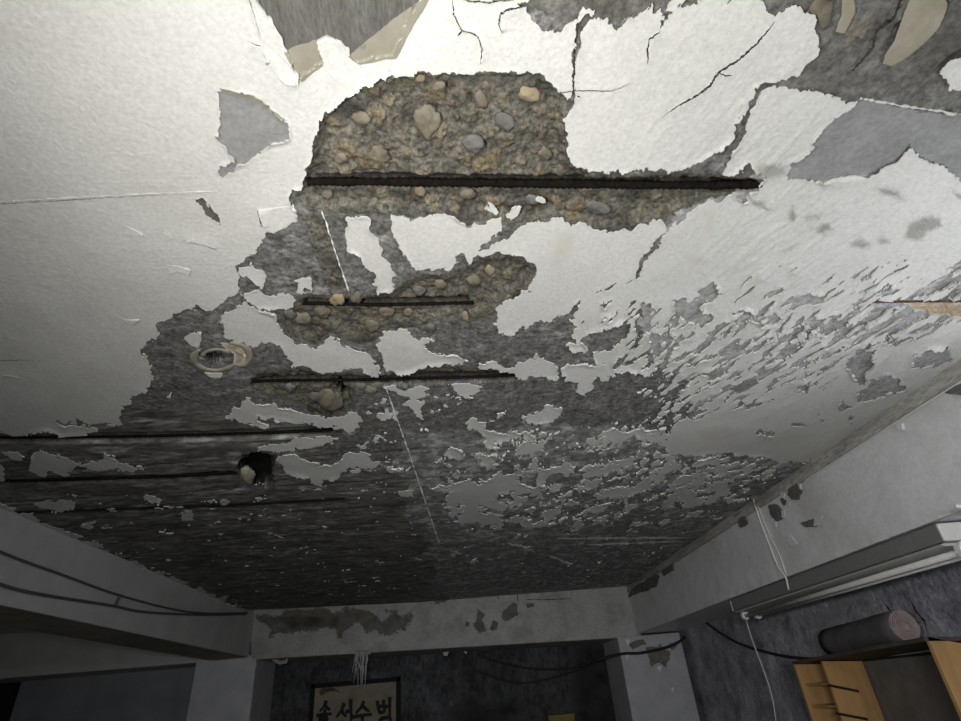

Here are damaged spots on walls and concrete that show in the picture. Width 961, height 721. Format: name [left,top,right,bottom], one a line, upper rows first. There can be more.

peeling [258,0,429,90]
crack [452,0,524,63]
crack [538,27,624,104]
crack [663,23,774,117]
peeling [216,88,290,177]
peeling [292,0,961,509]
peeling [0,193,803,610]
peeling [801,516,823,527]
peeling [465,603,534,633]